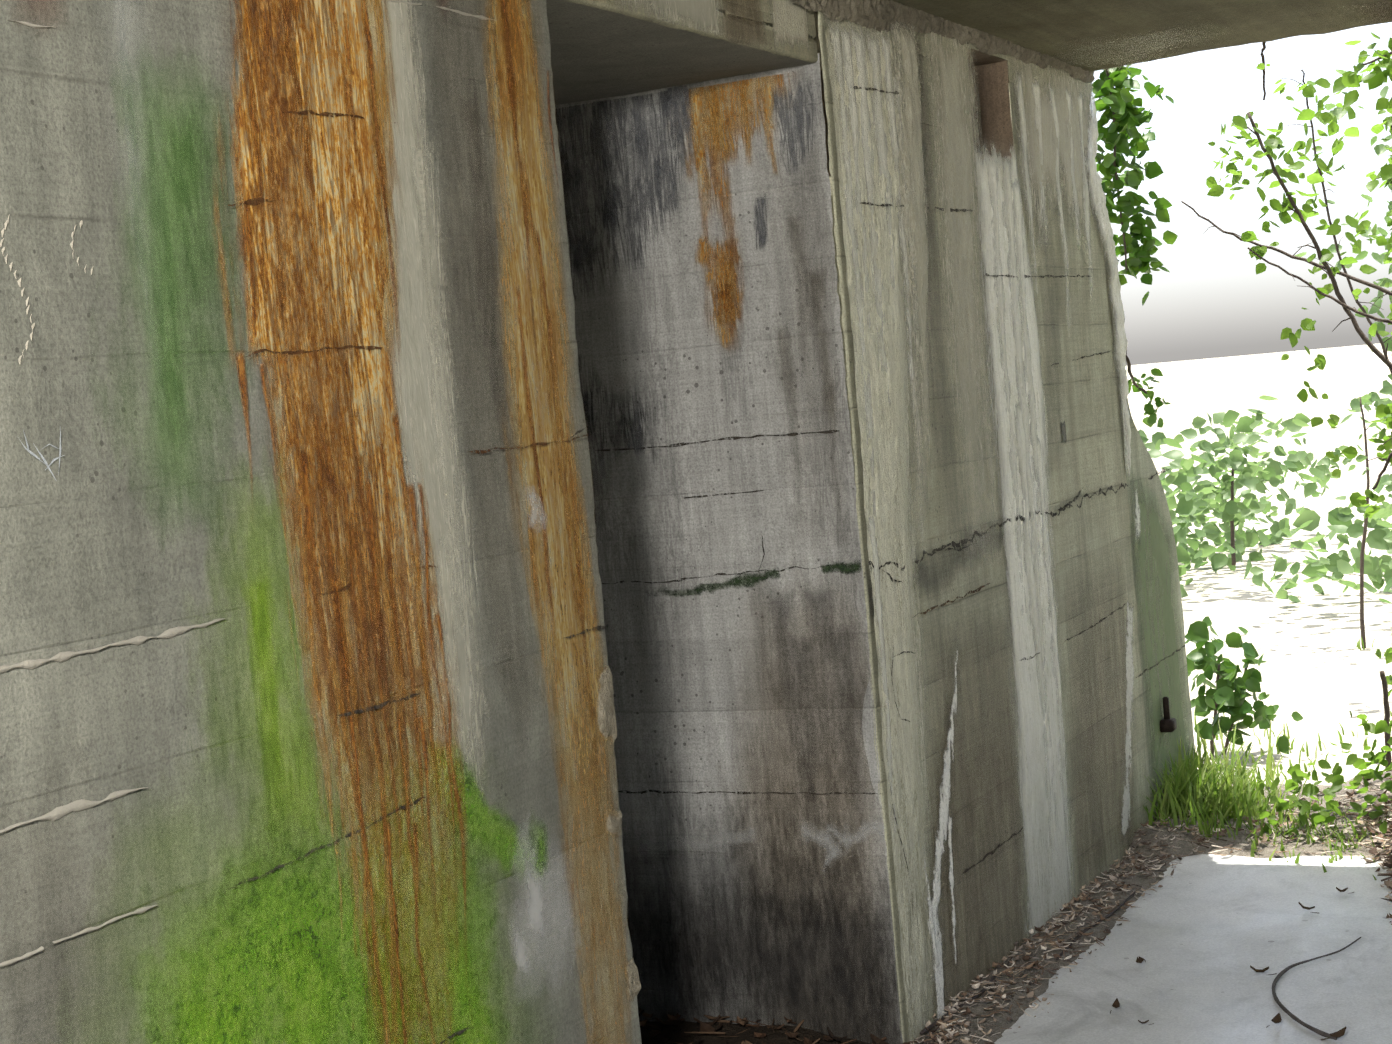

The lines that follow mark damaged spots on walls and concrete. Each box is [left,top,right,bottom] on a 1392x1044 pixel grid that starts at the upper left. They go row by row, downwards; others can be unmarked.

spalling [790,0,1095,83]
rust [682,73,790,347]
leakage [365,0,489,801]
rust [231,0,466,1044]
rust [487,0,629,1044]
crack [602,468,1171,596]
leakage [621,0,1176,1044]
crack [891,646,917,722]
crack [914,583,990,617]
crack [1019,603,1126,661]
leakage [528,874,542,931]